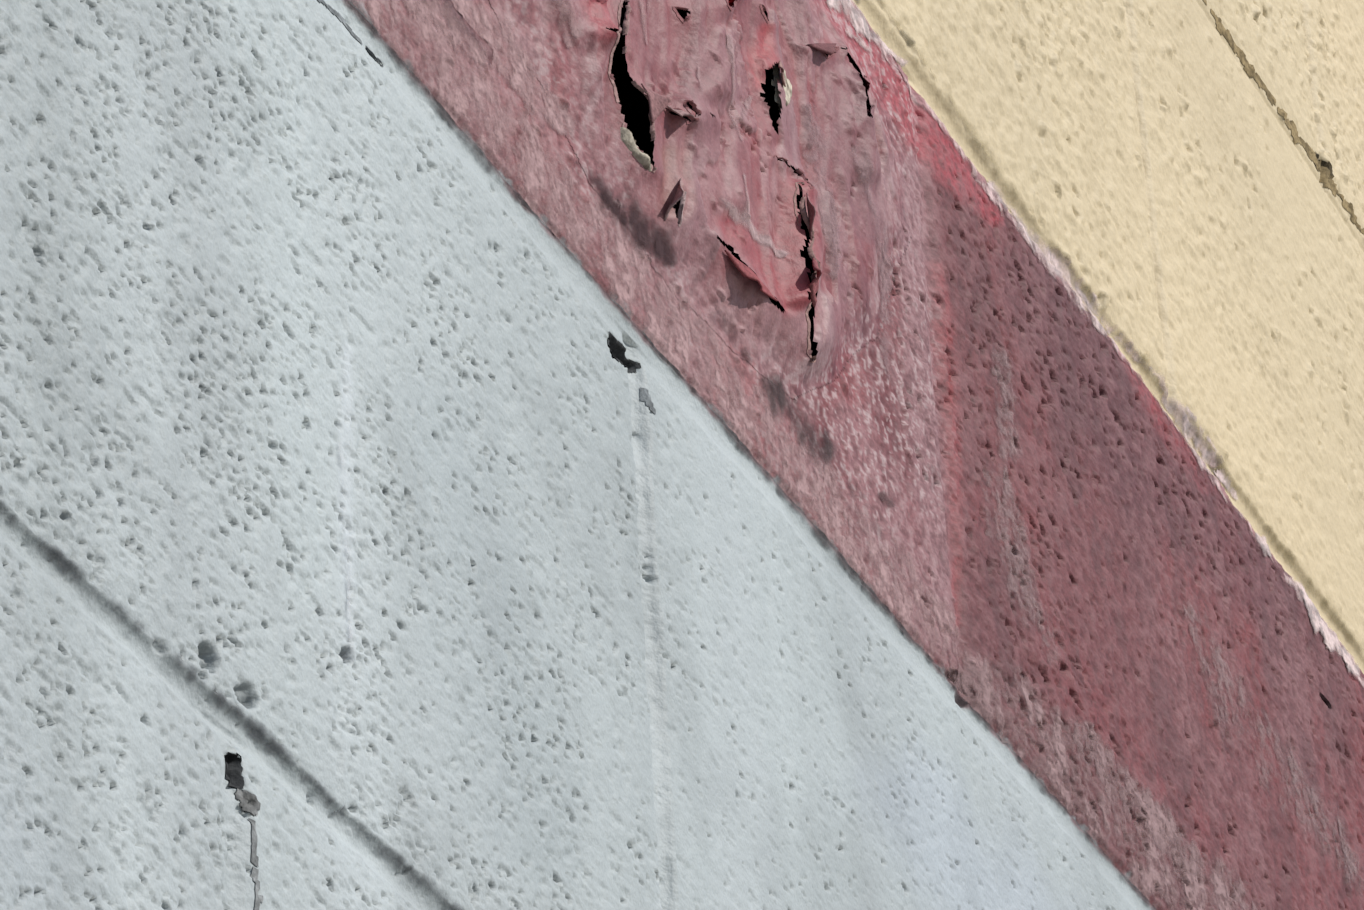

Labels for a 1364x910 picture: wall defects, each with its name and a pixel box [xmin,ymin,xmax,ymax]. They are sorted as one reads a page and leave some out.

peeling [489,0,1142,399]
peeling [1161,384,1237,500]
crack [248,818,263,910]